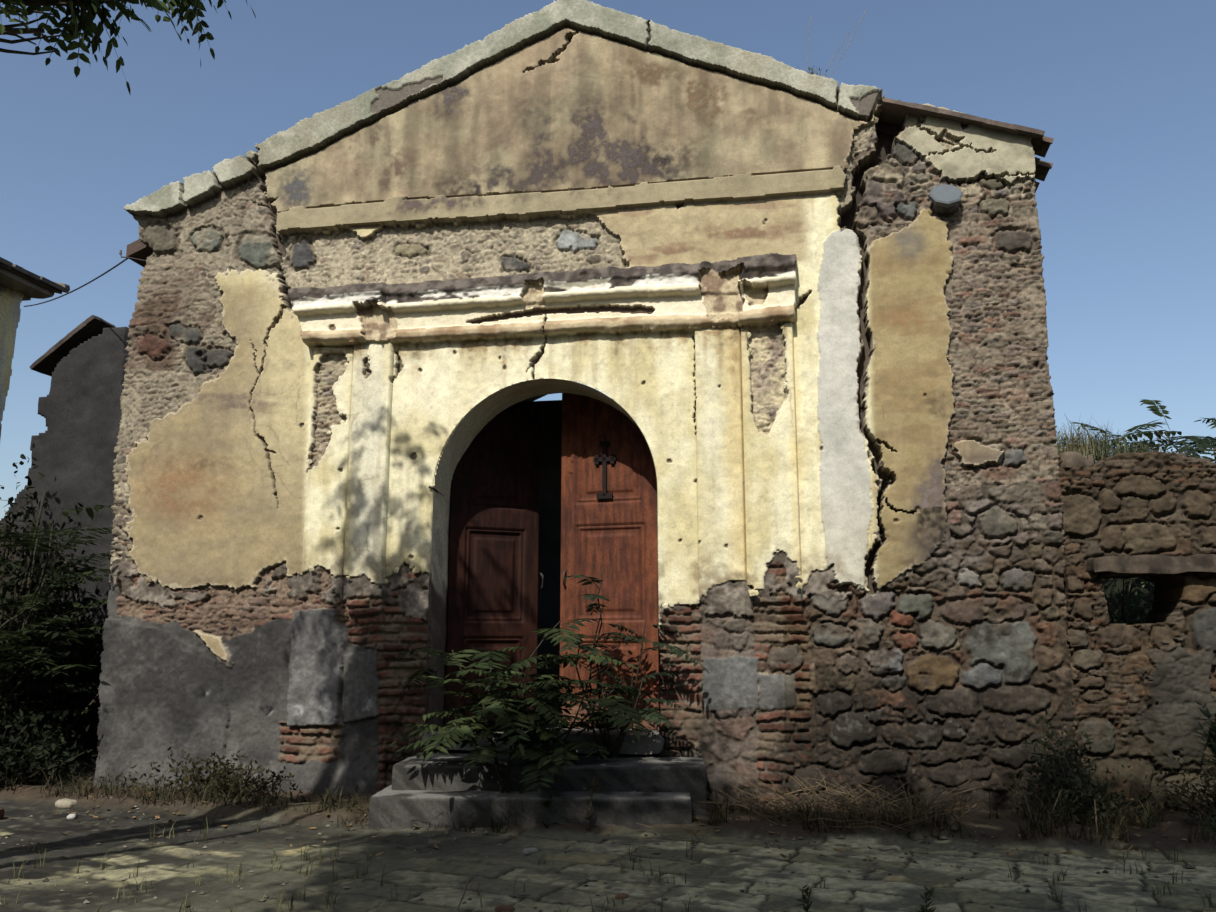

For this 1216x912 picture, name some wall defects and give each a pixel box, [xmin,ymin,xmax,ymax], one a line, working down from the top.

water stain [398,109,679,209]
crack [524,30,579,73]
crack [250,147,292,507]
spalling [112,170,631,486]
crack [838,109,1035,594]
spalling [93,533,432,796]
crack [1062,512,1072,668]